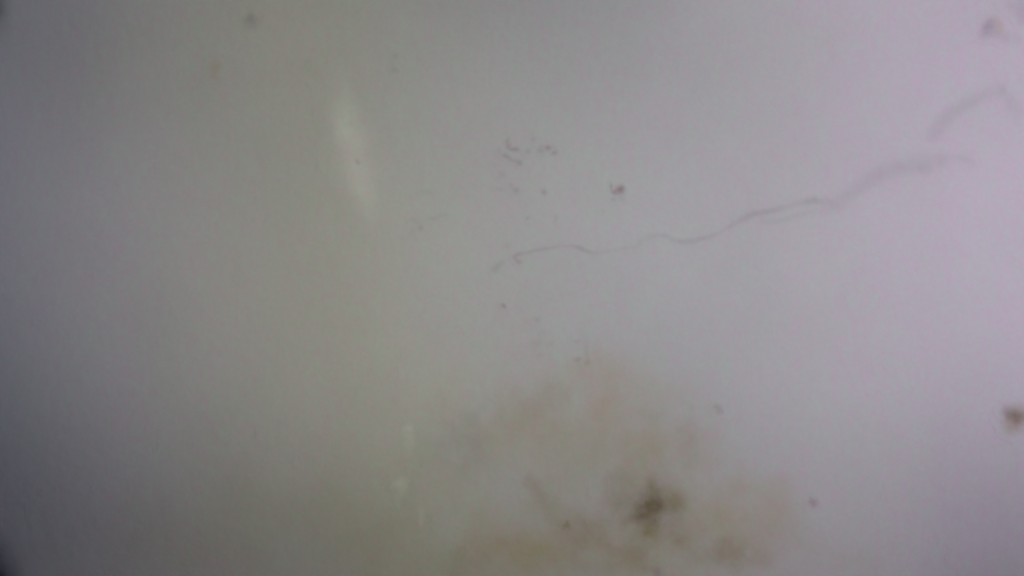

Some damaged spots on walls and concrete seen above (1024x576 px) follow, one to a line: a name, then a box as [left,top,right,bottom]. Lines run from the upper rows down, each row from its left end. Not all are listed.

damp [337,306,996,576]